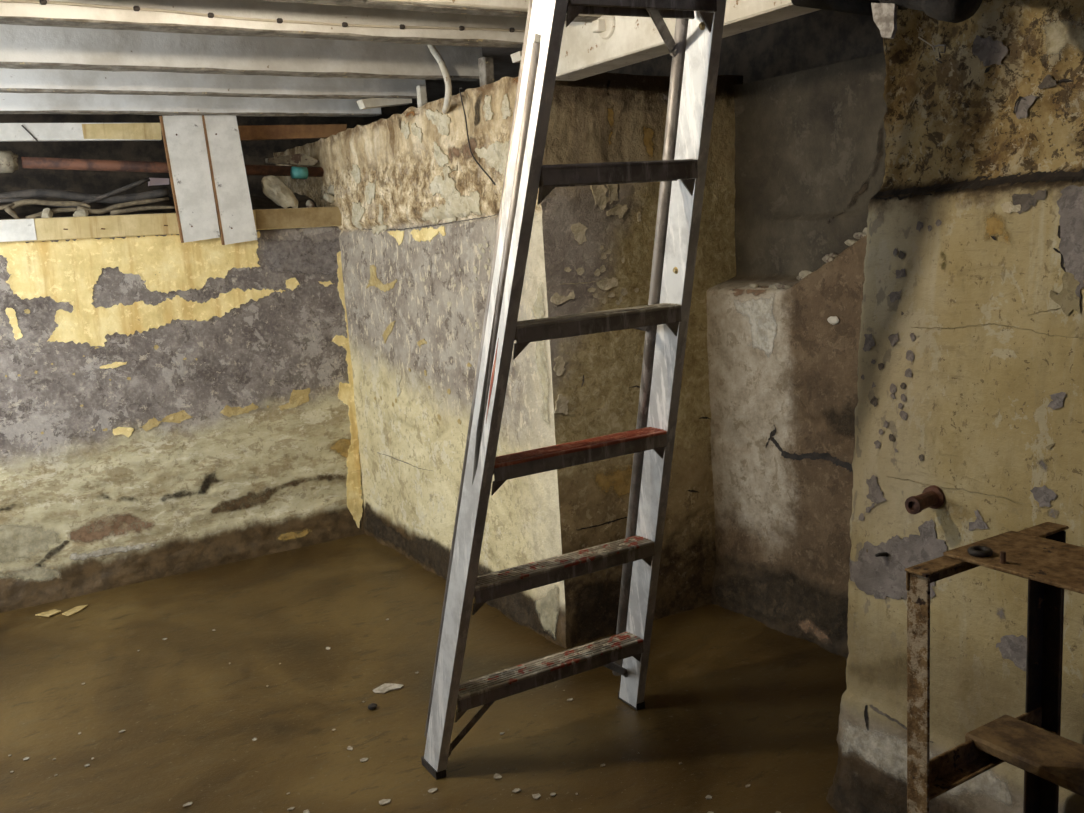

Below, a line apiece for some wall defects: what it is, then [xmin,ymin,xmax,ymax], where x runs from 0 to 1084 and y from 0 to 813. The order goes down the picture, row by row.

peeling [1013,74,1073,119]
peeling [1000,185,1084,316]
peeling [0,231,363,528]
crack [766,425,853,472]
water stain [162,474,219,501]
water stain [211,475,345,514]
peeling [1030,485,1057,518]
water stain [0,514,155,581]
peeling [849,519,947,600]